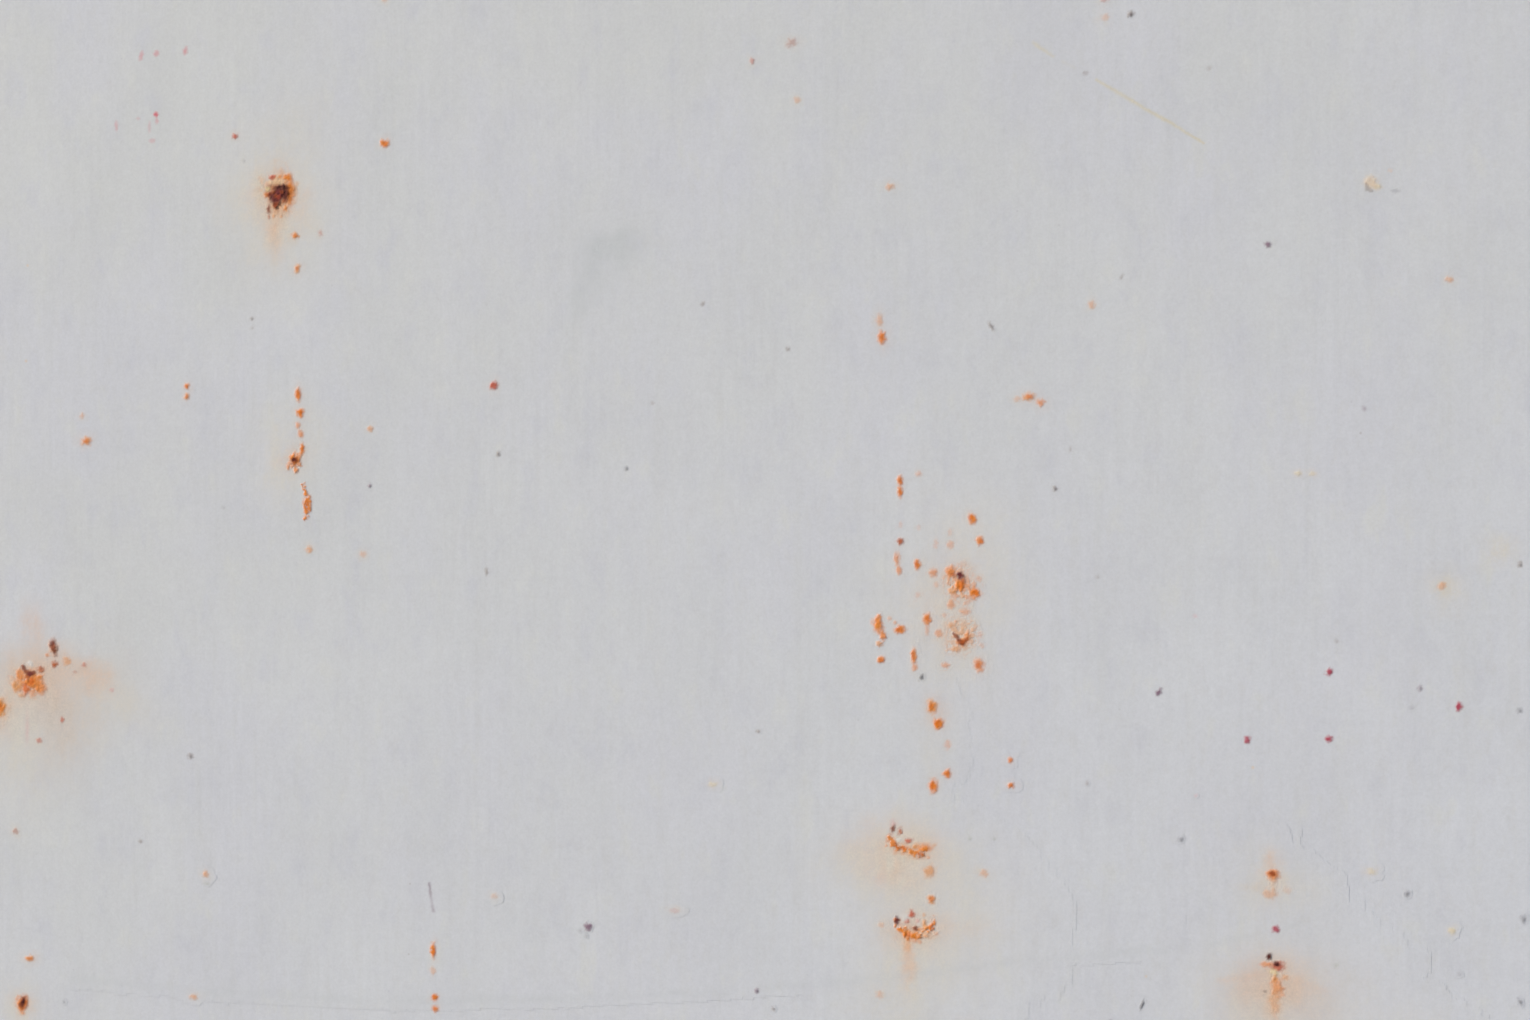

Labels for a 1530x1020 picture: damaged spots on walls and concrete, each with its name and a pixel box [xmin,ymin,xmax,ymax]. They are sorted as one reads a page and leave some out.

rust [0,589,181,858]
rust [827,439,1061,795]
rust [1141,899,1431,1020]